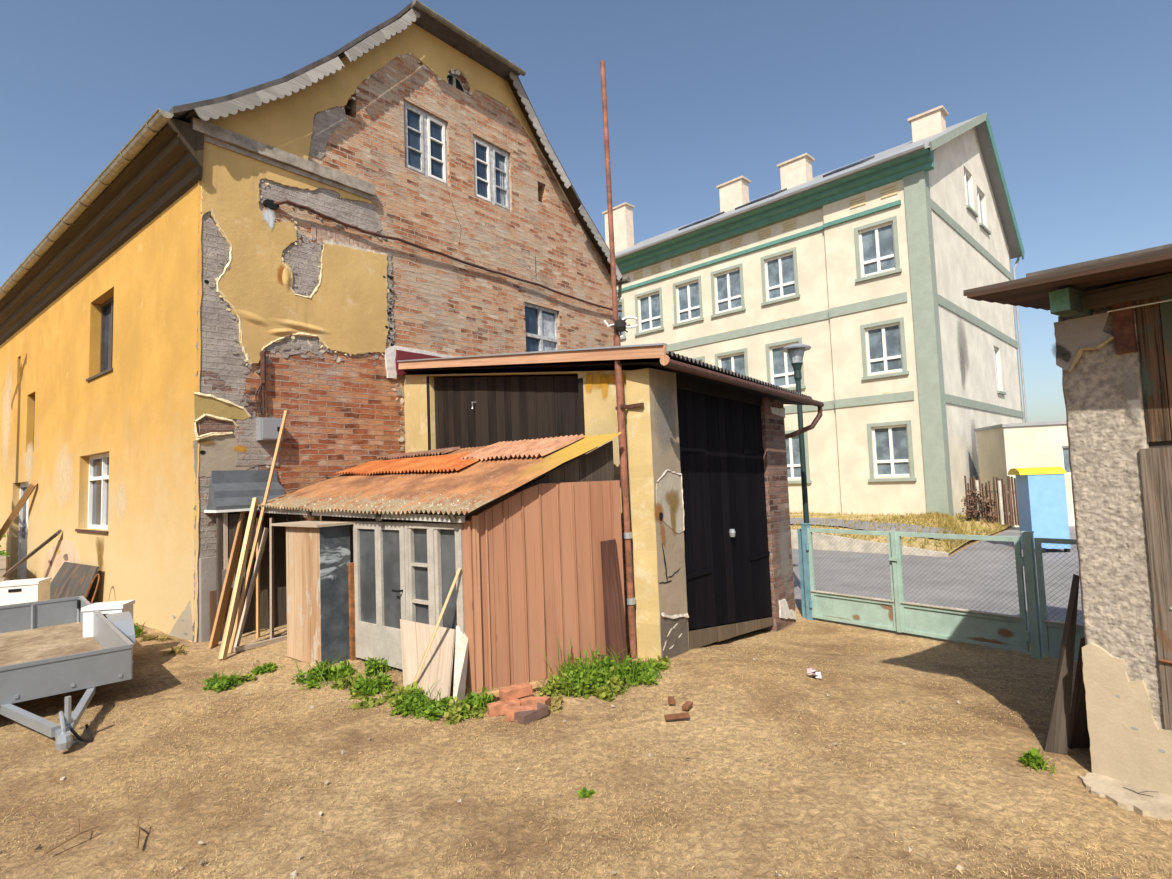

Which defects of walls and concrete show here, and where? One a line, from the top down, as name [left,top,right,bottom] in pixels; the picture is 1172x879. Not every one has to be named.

flaking render [169,54,614,642]
flaking render [1054,312,1114,372]
spalling [656,469,685,534]